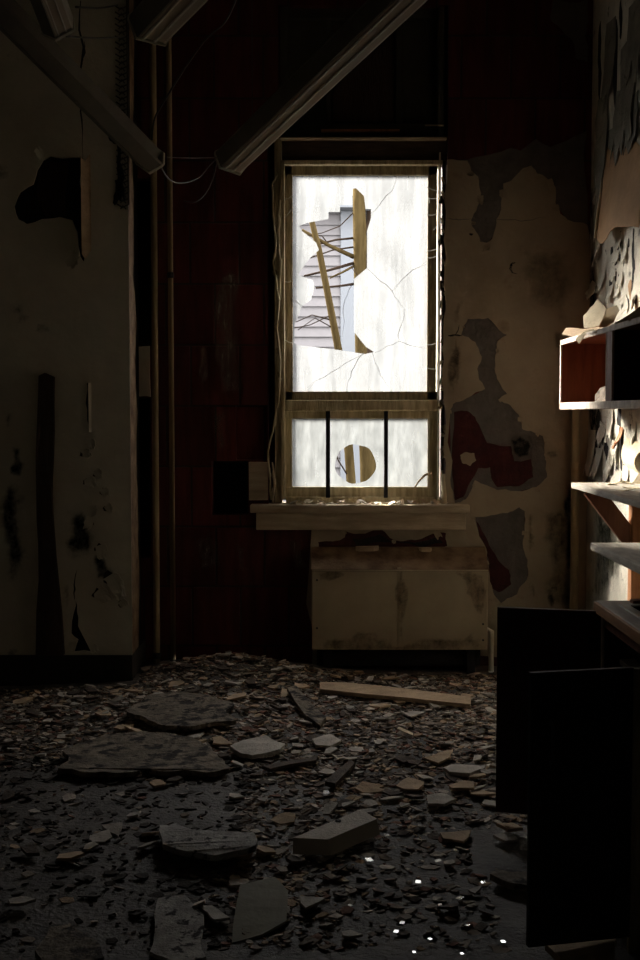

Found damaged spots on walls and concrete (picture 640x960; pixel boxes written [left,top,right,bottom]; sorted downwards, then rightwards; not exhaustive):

flaking render [461,0,640,344]
peeling [438,218,447,321]
flaking render [437,318,548,503]
flaking render [473,508,528,607]